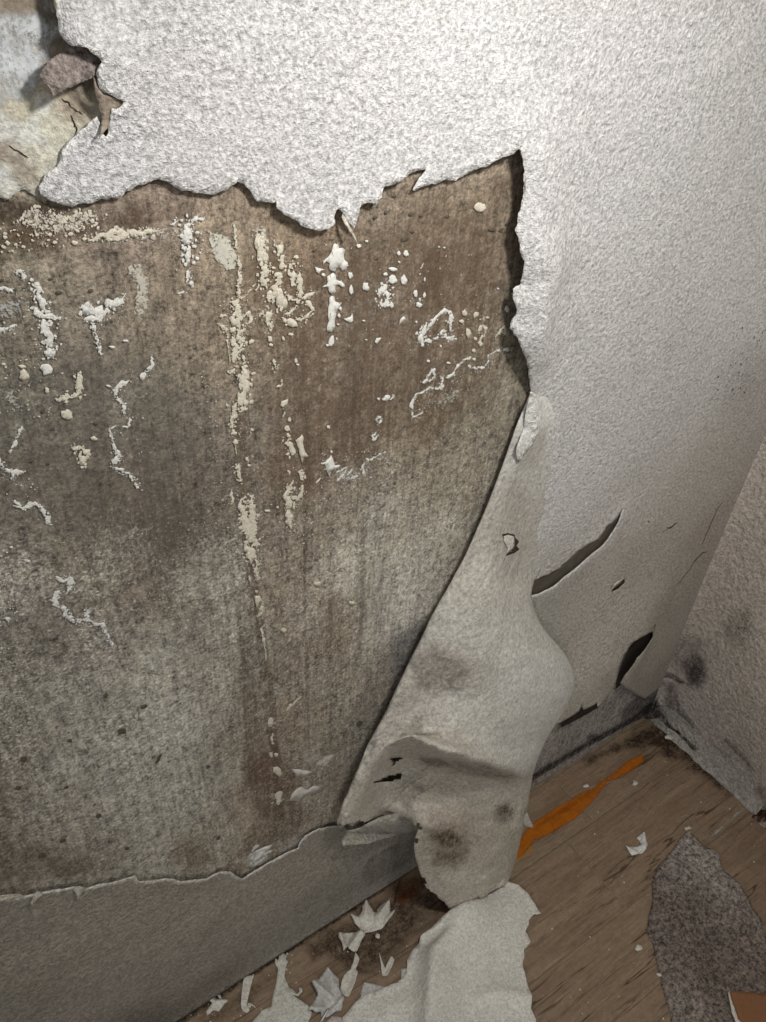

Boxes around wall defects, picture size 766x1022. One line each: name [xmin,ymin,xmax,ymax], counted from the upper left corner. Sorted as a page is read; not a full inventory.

peeling [0,0,114,202]
water stain [0,203,94,247]
peeling [71,228,160,245]
peeling [16,269,58,375]
peeling [61,373,83,420]
peeling [81,296,129,354]
peeling [71,380,139,489]
peeling [219,223,426,483]
water stain [252,198,496,493]
peeling [399,308,509,418]
peeling [229,399,308,660]
peeling [267,717,321,804]